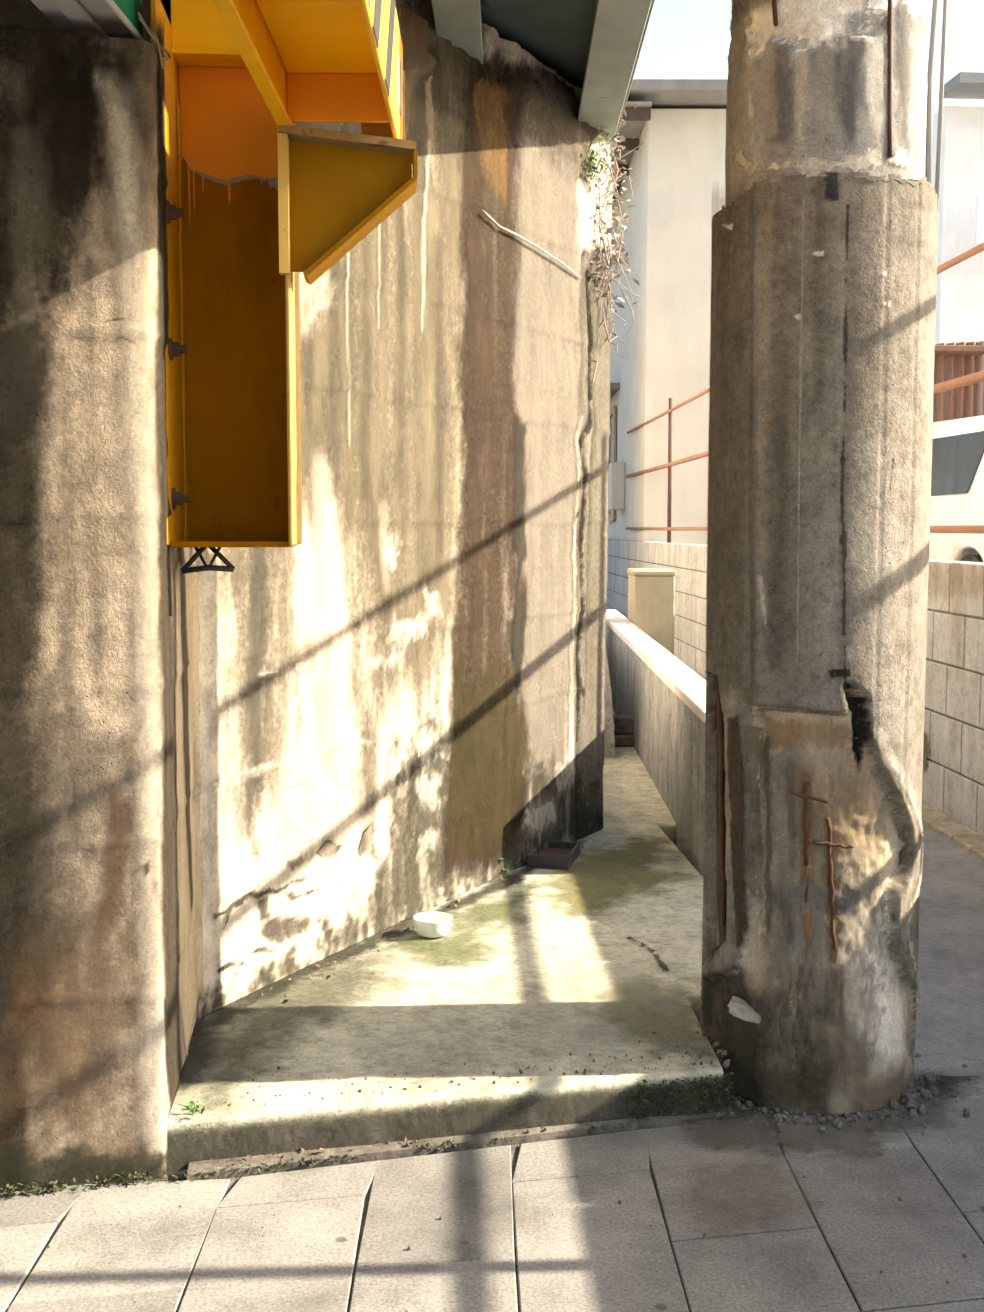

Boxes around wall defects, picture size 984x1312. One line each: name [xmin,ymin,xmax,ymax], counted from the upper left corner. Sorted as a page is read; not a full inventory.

spalling [730,0,928,177]
damp [0,0,730,1192]
crack [568,268,598,840]
crack [840,205,849,684]
crack [218,946,276,974]
crack [214,876,317,925]
spalling [701,672,923,1115]